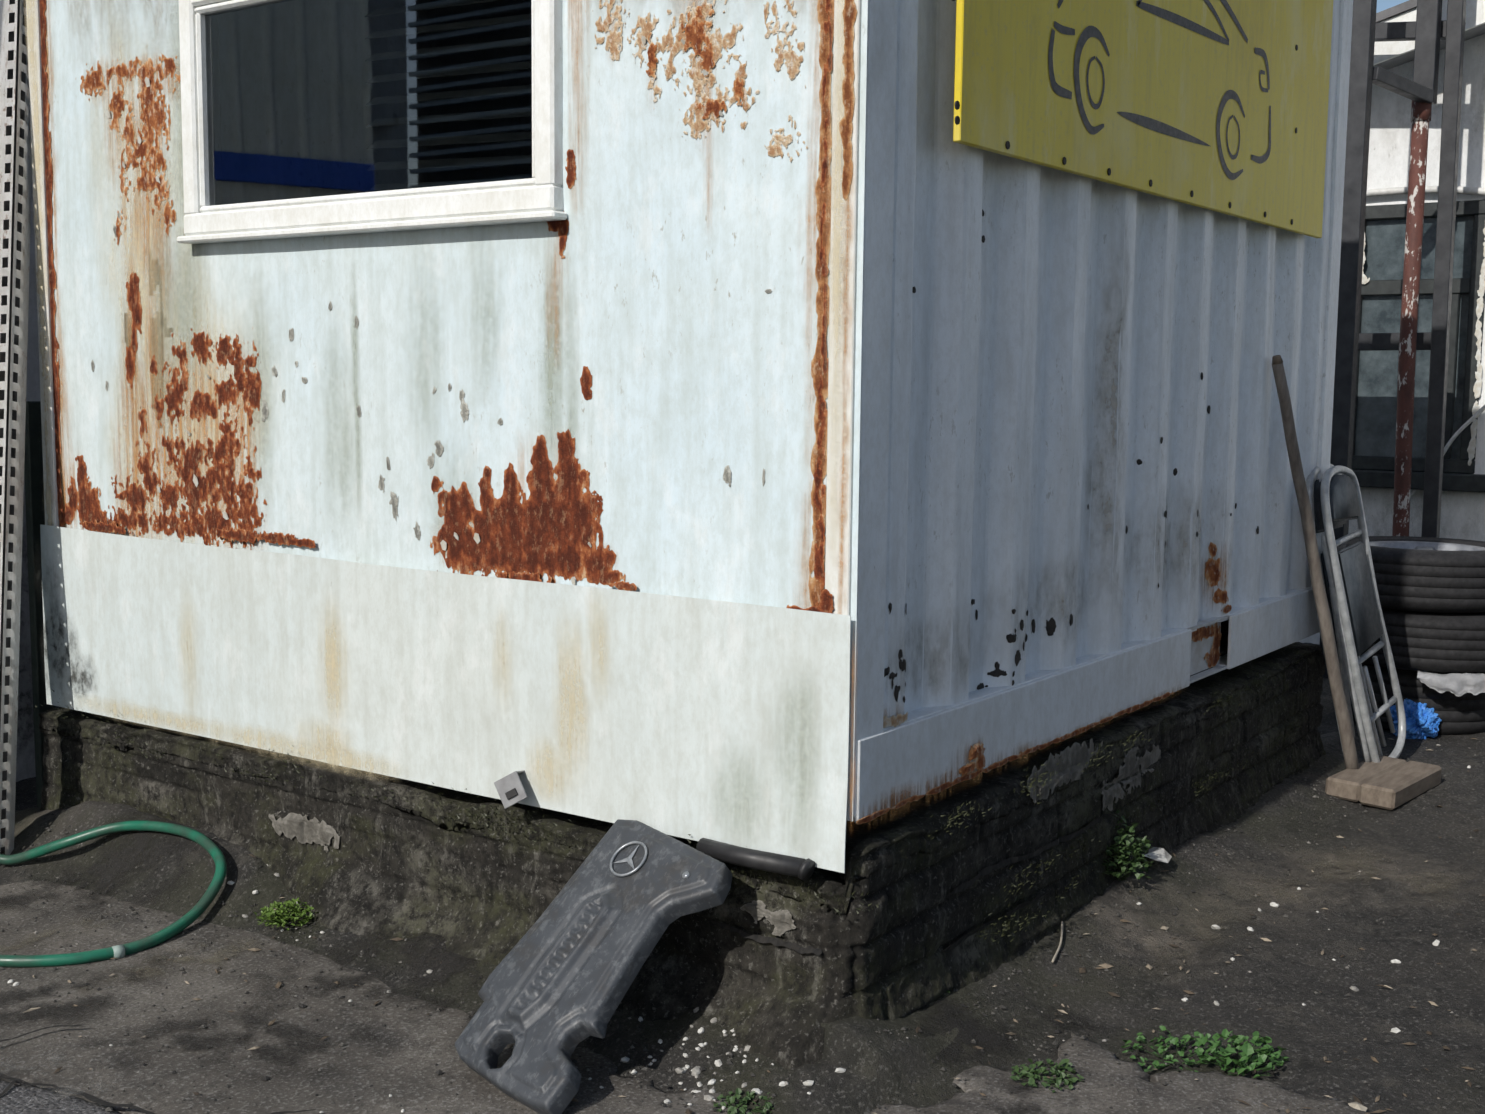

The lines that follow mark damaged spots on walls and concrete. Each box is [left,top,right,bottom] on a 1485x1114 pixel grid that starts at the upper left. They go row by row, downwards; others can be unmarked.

rust [27,0,316,550]
rust [786,0,857,613]
rust [430,429,637,591]
peeling [884,649,906,703]
peeling [977,609,1073,690]
rust [1191,542,1232,668]
rust [856,691,1174,824]
spalling [1026,738,1103,805]
spalling [1101,745,1161,811]
crack [0,1024,155,1114]
crack [270,1106,319,1114]